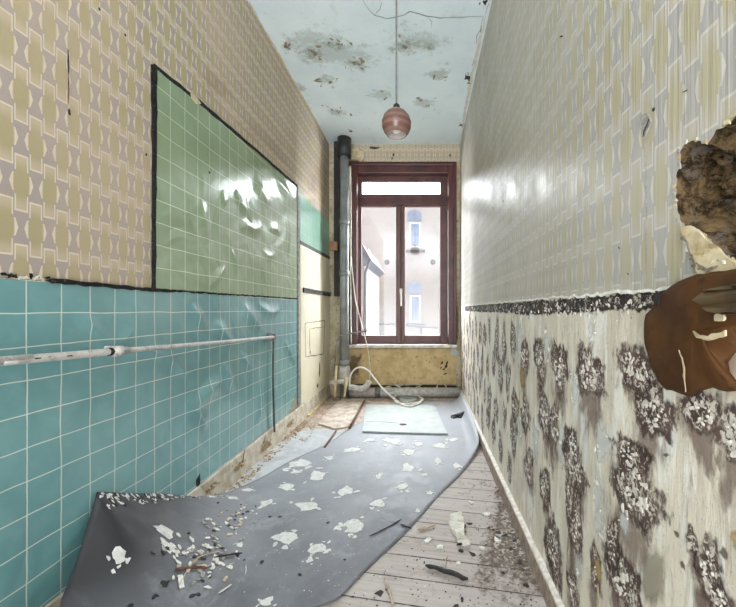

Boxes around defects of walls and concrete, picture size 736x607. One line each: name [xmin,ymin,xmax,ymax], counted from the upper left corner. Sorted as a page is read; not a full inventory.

spalling [671,113,736,274]
damp [350,356,361,375]
peeling [494,403,581,483]
peeling [493,299,651,388]
peeling [570,360,596,403]
peeling [643,398,664,427]
peeling [686,400,713,426]
peeling [728,353,736,379]
peeling [618,440,649,532]
peeling [569,508,582,598]
peeling [593,475,628,596]
peeling [700,551,726,607]